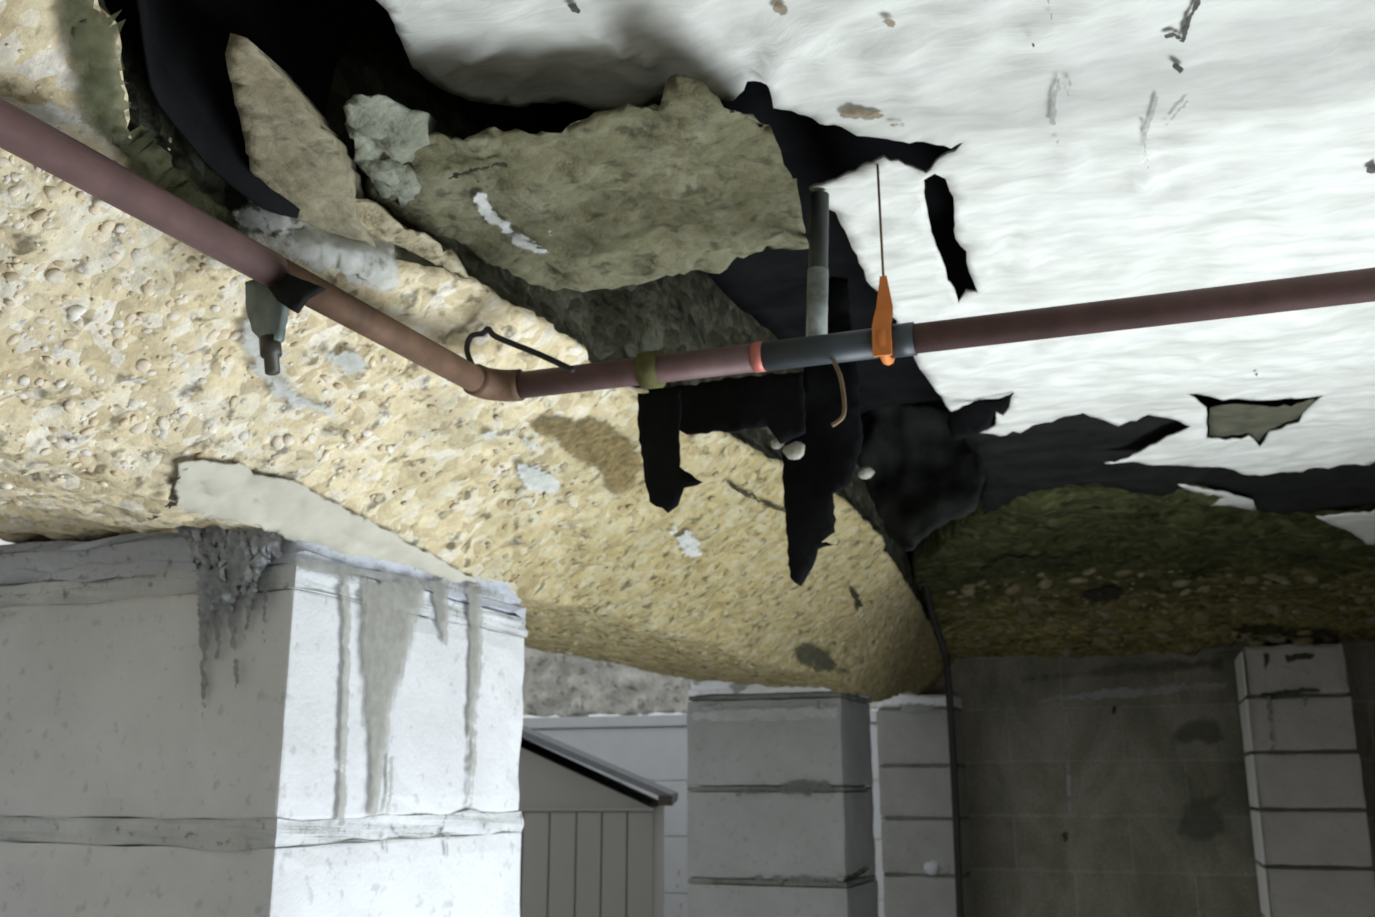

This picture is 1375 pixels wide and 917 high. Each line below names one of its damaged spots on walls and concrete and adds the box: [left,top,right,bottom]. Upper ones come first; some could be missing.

spalling [225,33,809,293]
spalling [534,418,643,508]
water stain [175,526,504,832]